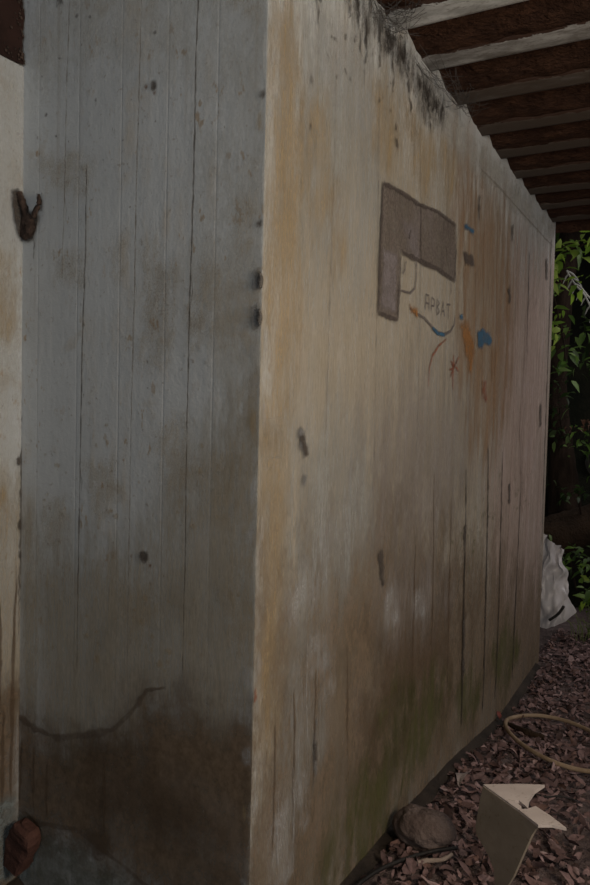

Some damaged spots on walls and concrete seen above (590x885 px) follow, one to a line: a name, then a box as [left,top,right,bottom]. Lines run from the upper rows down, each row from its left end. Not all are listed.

water stain [355,0,373,48]
water stain [374,15,445,133]